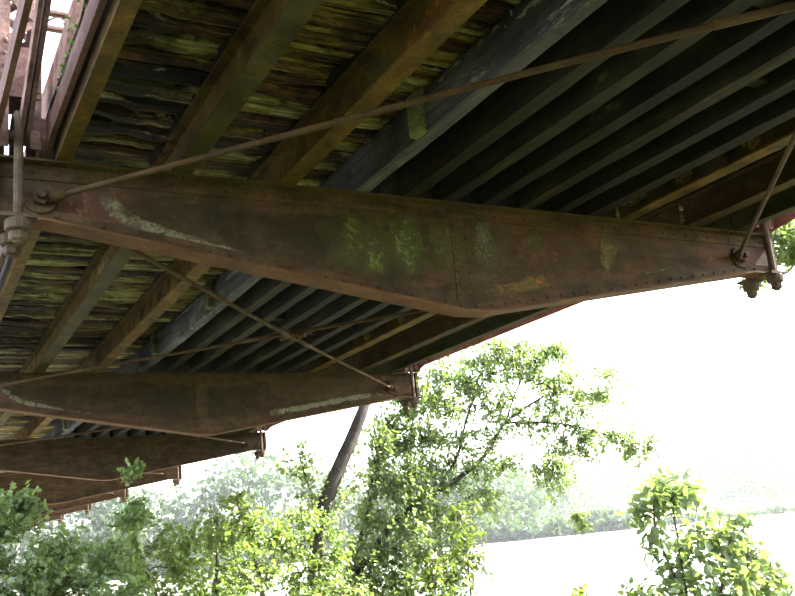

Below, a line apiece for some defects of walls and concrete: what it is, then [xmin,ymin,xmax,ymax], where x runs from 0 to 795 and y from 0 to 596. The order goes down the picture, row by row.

water stain [105,190,238,251]
rust [490,274,552,295]